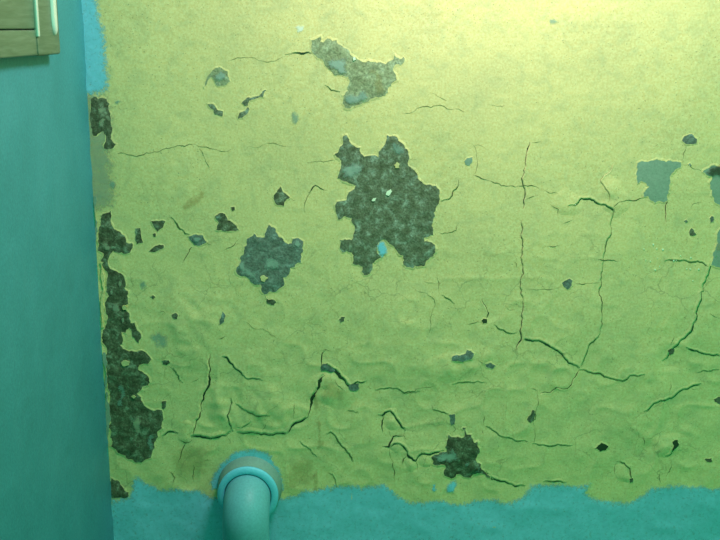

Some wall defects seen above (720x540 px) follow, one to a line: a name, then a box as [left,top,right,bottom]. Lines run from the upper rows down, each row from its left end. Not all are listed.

peeling [309,34,406,111]
peeling [89,95,118,151]
peeling [333,133,442,277]
peeling [634,157,692,205]
peeling [96,209,170,464]
peeling [234,223,305,306]
crack [441,141,645,447]
crack [643,242,720,419]
crack [160,337,429,481]
crack [377,408,444,476]
spalling [430,413,491,480]
crack [483,468,567,487]